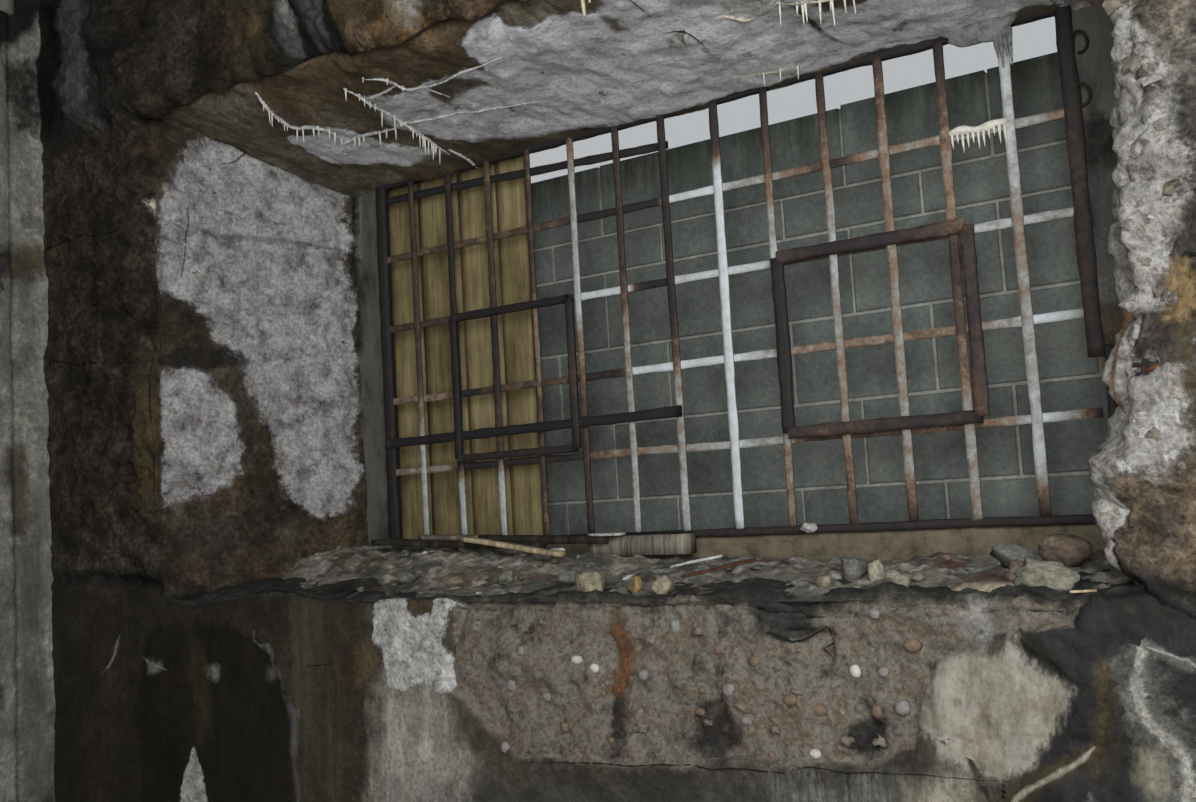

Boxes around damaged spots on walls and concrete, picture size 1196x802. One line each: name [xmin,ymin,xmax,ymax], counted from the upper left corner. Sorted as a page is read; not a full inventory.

damp [0,0,83,139]
damp [430,78,489,102]
damp [403,105,708,182]
damp [602,17,627,32]
damp [766,59,862,92]
damp [814,0,867,12]
spalling [156,137,364,519]
spalling [287,0,1196,585]
rust [610,616,636,757]
spalling [372,595,1084,781]
crack [1129,644,1196,802]